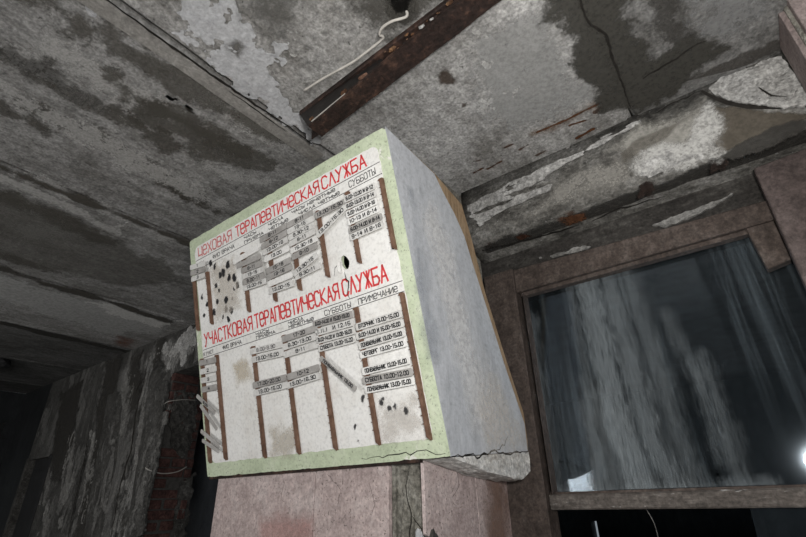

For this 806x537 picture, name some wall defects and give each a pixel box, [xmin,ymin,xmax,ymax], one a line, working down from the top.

damp [0,0,292,216]
peeling [171,0,321,146]
corrosion [439,70,455,84]
corrosion [536,105,600,139]
crack [580,0,631,108]
damp [475,0,782,130]
flaking render [467,56,806,228]
damp [0,165,195,467]
damp [51,380,83,484]
peeling [37,429,97,537]
flaking render [102,325,197,537]
spalling [414,497,438,537]